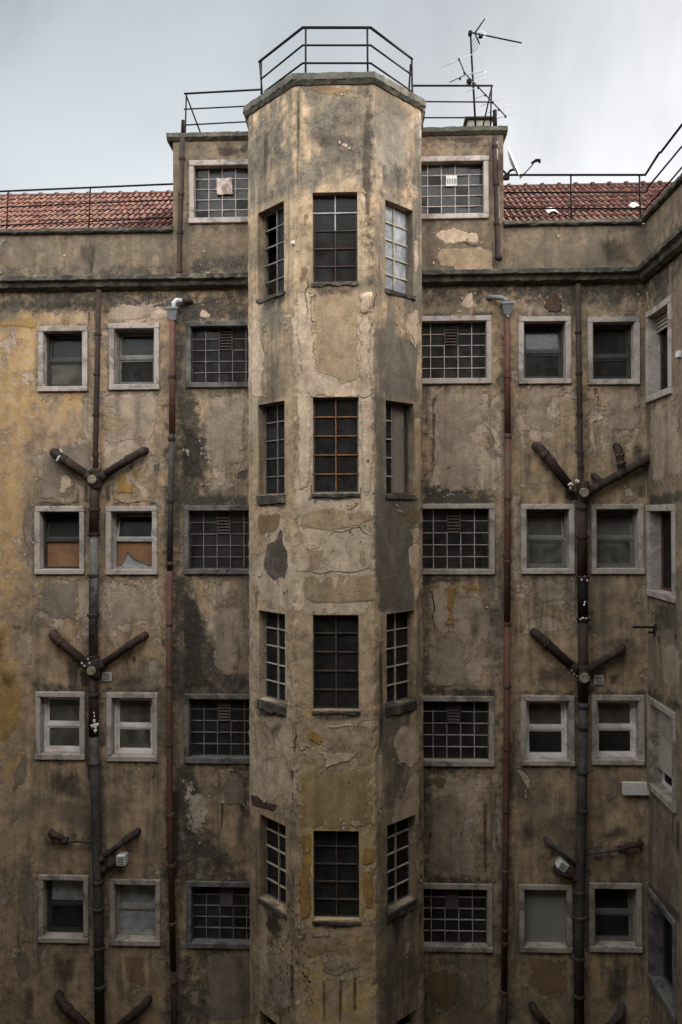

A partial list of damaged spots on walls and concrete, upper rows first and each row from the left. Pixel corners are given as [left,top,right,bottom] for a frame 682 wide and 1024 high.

flaking render [414,227,495,271]
flaking render [535,293,565,313]
water stain [182,425,240,488]
flaking render [255,510,288,602]
water stain [184,594,210,688]
flaking render [391,725,476,882]
flaking render [266,871,376,1017]